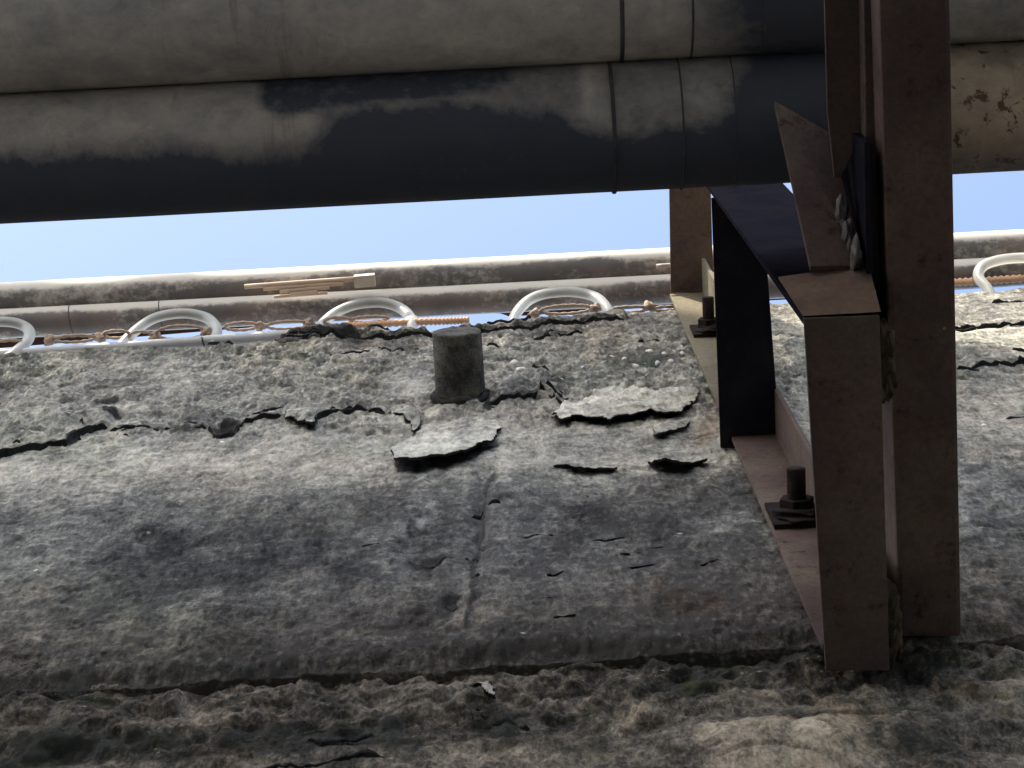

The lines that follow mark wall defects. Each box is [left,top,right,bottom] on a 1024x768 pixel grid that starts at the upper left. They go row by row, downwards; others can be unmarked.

crack [955,299,1024,371]
crack [0,404,387,458]
peeling [388,399,501,473]
peeling [554,452,617,476]
peeling [552,382,700,439]
peeling [648,457,707,473]